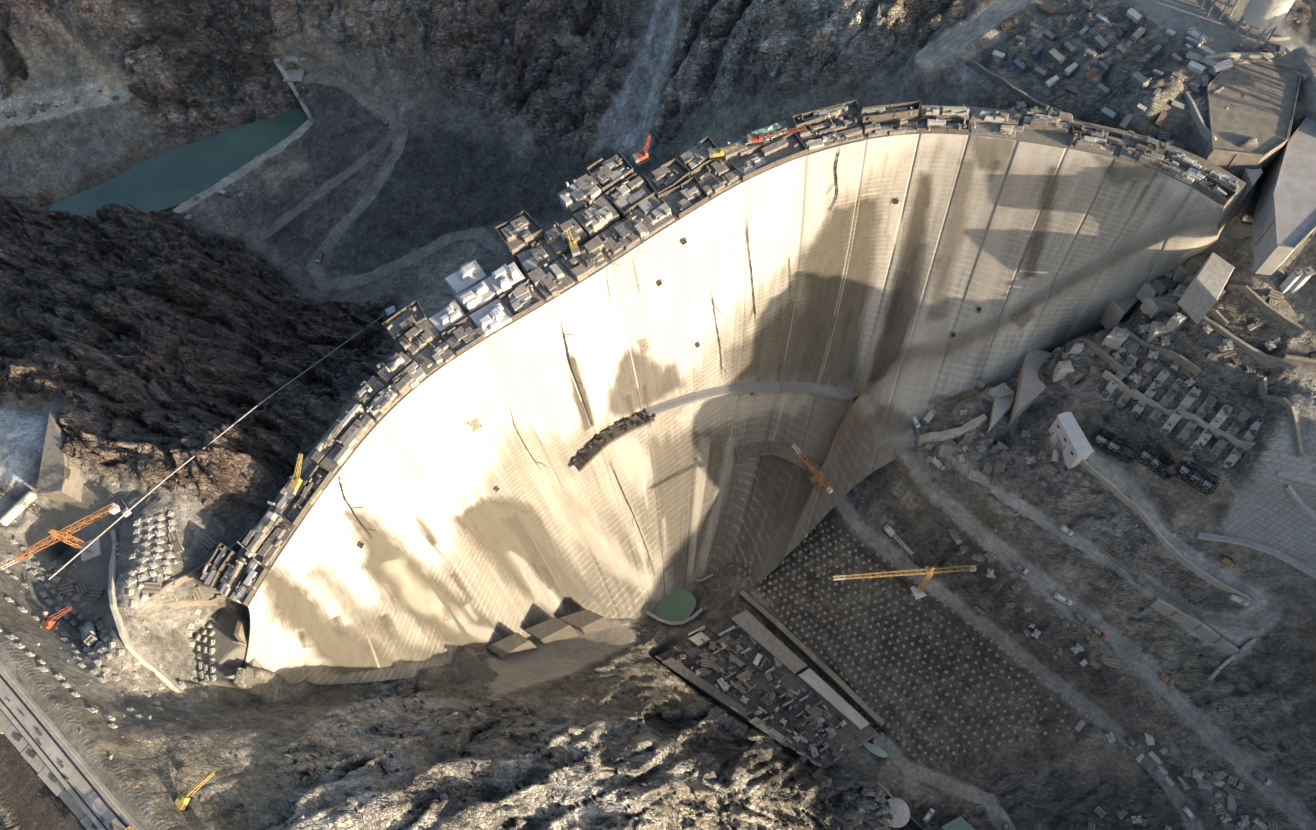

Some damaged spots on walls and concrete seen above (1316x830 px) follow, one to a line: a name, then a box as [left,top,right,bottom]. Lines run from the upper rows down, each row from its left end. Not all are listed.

crack [711,217,756,373]
water stain [731,176,931,388]
crack [826,149,840,211]
water stain [1025,180,1054,277]
water stain [568,356,593,429]
water stain [610,351,680,416]
water stain [346,512,506,652]
water stain [456,499,596,617]